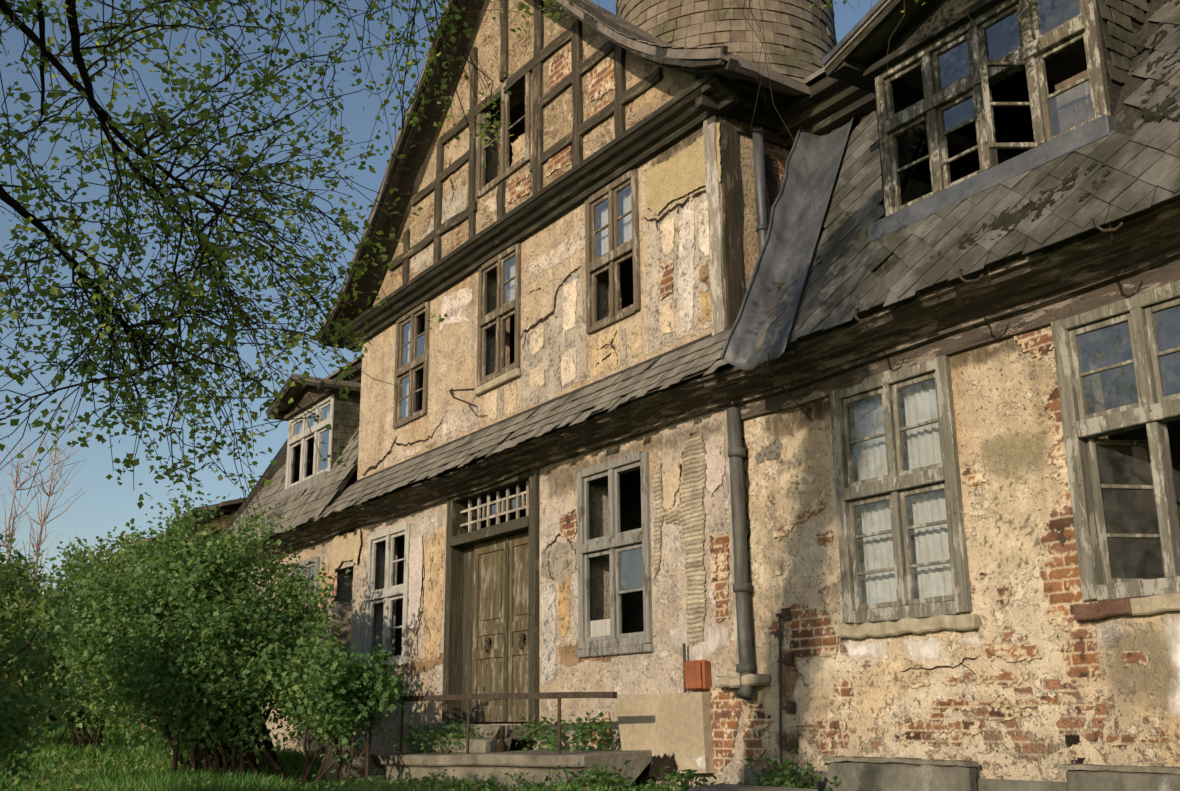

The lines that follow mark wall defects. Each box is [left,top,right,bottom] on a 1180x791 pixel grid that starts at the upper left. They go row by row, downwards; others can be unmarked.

crack [643,189,706,230]
peeling [371,193,712,474]
crack [520,266,581,346]
crack [362,410,448,476]
peeling [705,449,726,496]
peeling [540,512,628,685]
flaking render [708,521,731,623]
flaking render [705,687,773,776]
flaking render [768,599,838,663]
flaking render [816,642,1059,753]
flaking render [963,381,1104,682]
water stain [1089,618,1180,714]